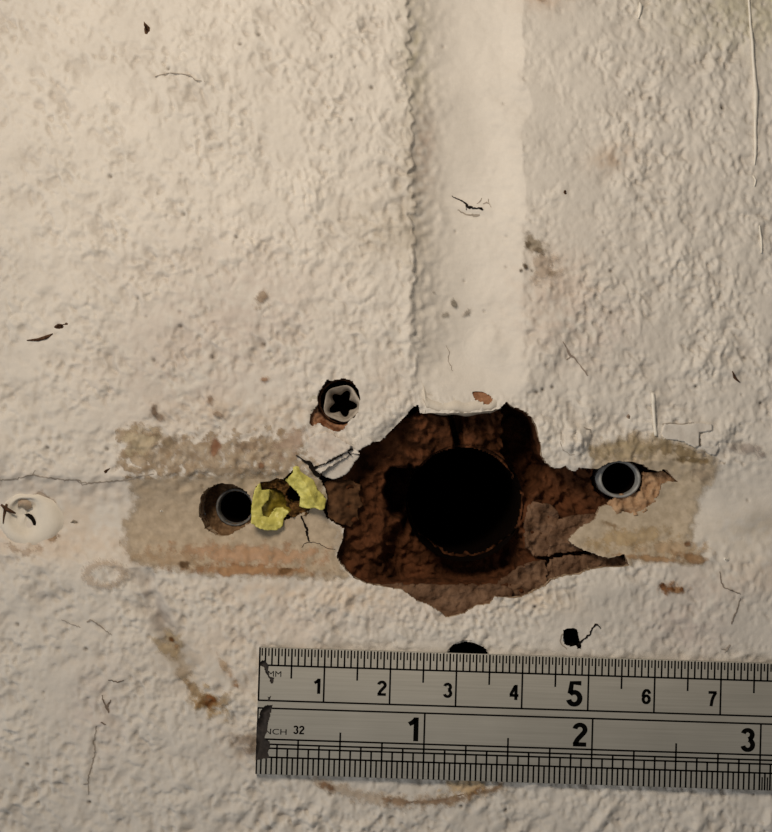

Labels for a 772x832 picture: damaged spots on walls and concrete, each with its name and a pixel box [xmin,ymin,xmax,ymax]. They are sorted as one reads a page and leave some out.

crack [0,471,154,486]
spalling [115,381,719,617]